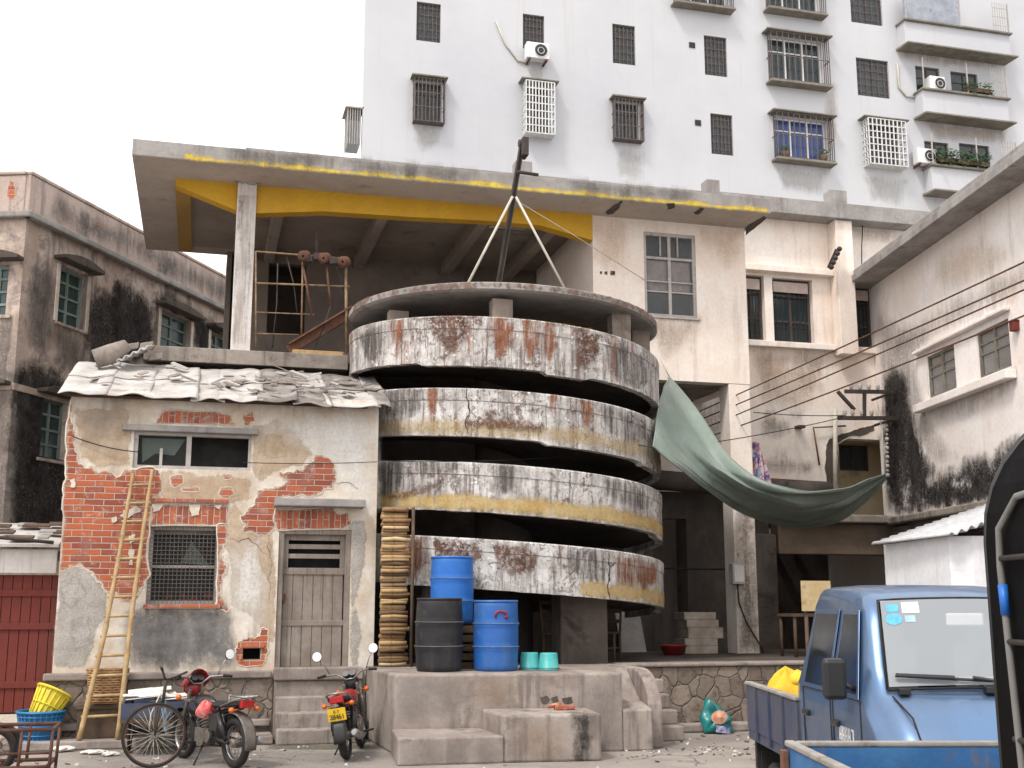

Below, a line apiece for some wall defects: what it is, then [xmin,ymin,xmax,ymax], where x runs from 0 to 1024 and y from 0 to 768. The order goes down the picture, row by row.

corrosion [391,320,401,355]
corrosion [494,318,556,359]
corrosion [576,329,598,369]
corrosion [428,388,437,412]
water stain [13,372,43,486]
water stain [883,371,1016,515]
spalling [59,399,351,668]
corrosion [408,541,423,577]
corrosion [617,557,657,587]
water stain [131,609,233,667]